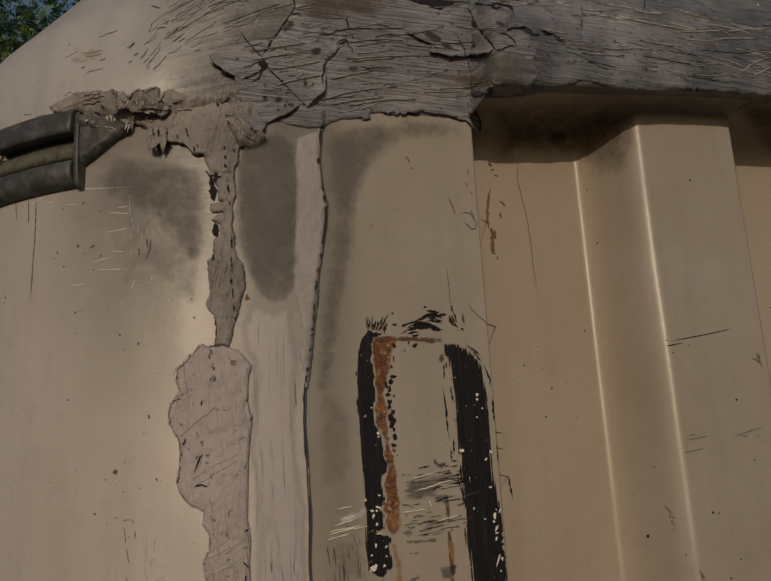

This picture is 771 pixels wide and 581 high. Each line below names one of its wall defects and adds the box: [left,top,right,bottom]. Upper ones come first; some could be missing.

crack [133,100,183,129]
crack [209,0,428,131]
peeling [410,7,494,57]
crack [450,1,564,131]
peeling [506,0,583,43]
corrosion [372,336,441,533]